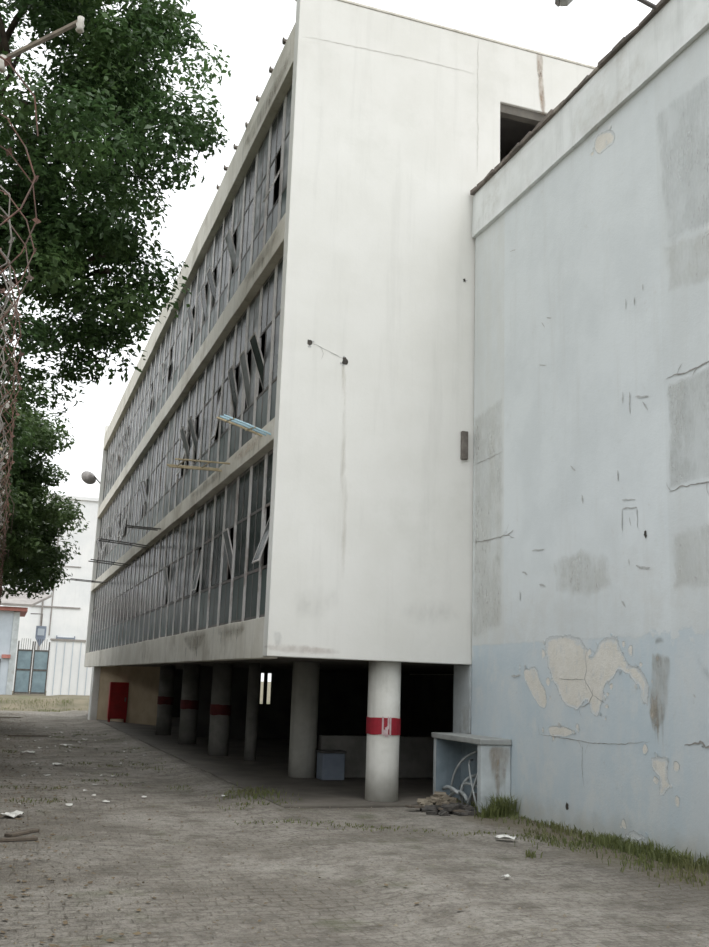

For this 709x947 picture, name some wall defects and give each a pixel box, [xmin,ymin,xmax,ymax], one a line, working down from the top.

crack [666,361,709,379]
peeling [519,633,654,720]